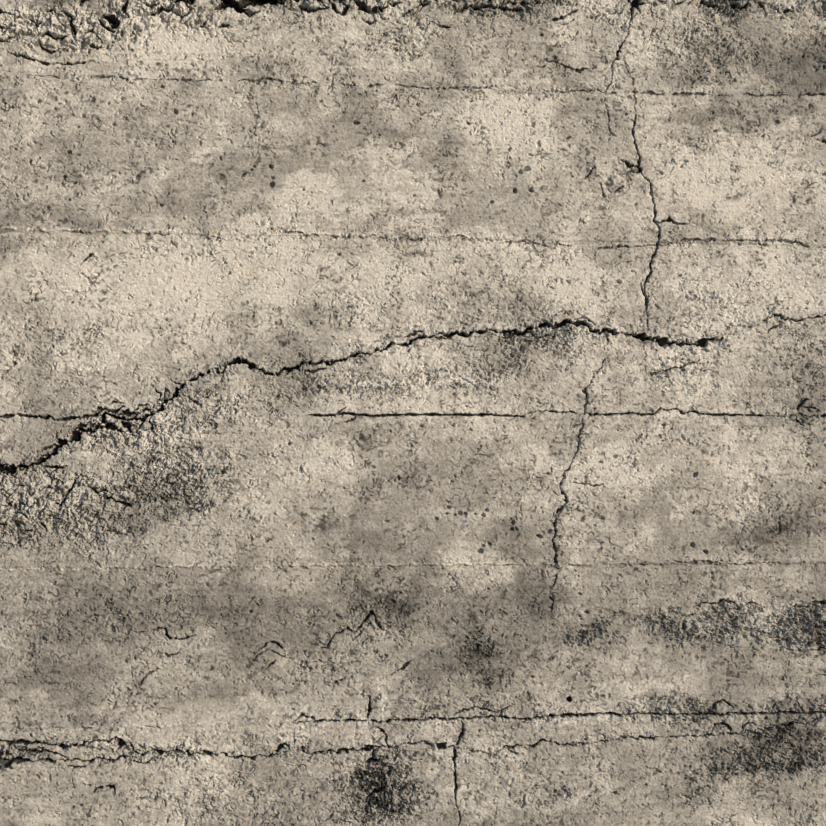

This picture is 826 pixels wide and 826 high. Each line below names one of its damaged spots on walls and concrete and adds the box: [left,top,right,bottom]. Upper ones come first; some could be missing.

crack [0,0,826,619]
crack [30,696,826,825]